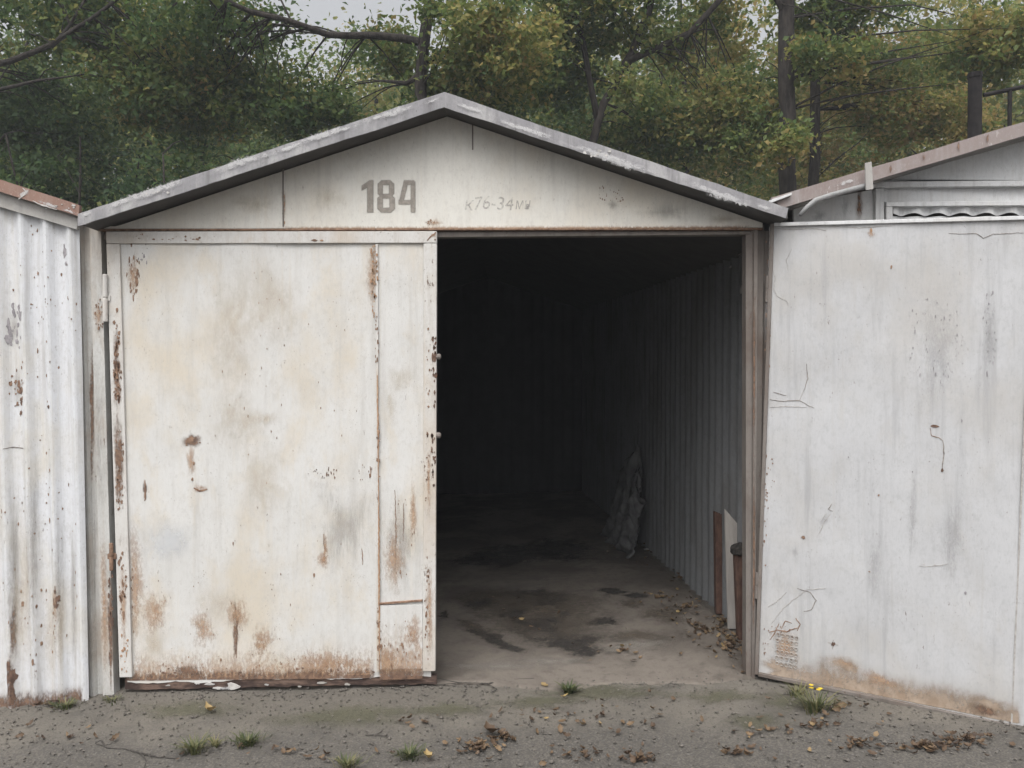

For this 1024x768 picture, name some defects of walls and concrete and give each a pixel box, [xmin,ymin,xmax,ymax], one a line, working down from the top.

crack [773,225,891,304]
crack [770,364,814,408]
corrosion [108,245,431,684]
crack [764,588,825,655]
corrosion [6,661,19,706]
corrosion [766,640,1019,723]